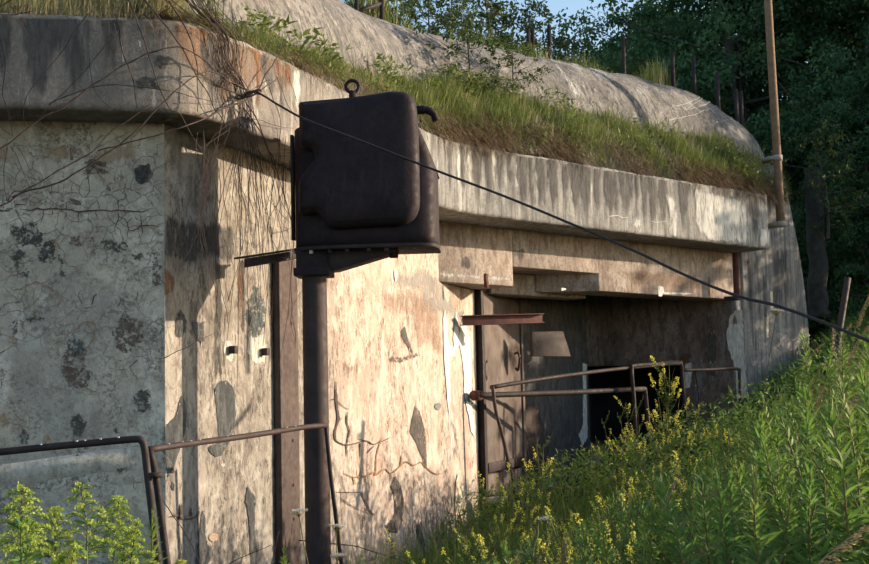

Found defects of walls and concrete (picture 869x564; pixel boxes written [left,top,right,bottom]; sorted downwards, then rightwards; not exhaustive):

damp [0,15,89,95]
corrosion [177,23,291,105]
crack [0,147,159,244]
damp [447,142,788,402]
crack [1,279,147,378]